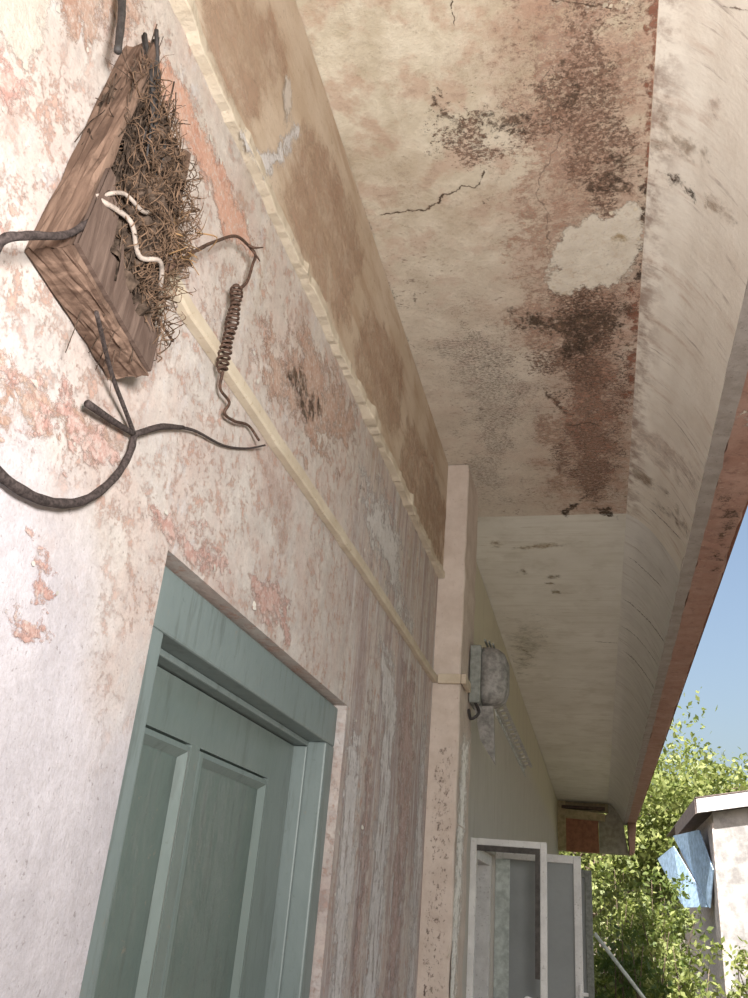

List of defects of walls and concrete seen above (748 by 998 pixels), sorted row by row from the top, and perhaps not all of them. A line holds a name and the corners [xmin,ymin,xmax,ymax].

peeling [0,42,35,115]
peeling [49,0,148,71]
peeling [160,55,258,258]
crack [383,171,485,215]
leakage [418,0,642,221]
flaking render [495,0,651,498]
crack [552,0,615,12]
peeling [0,346,124,470]
leakage [507,284,635,502]
peeling [5,527,59,644]
peeling [150,504,233,597]
peeling [247,573,291,646]